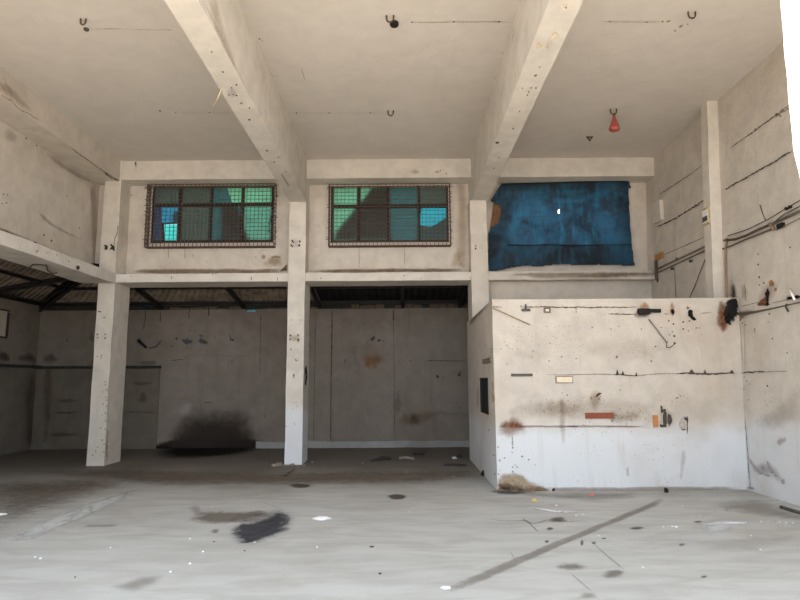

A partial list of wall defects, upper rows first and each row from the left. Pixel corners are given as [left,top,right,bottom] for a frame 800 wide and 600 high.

rust [718,304,726,330]